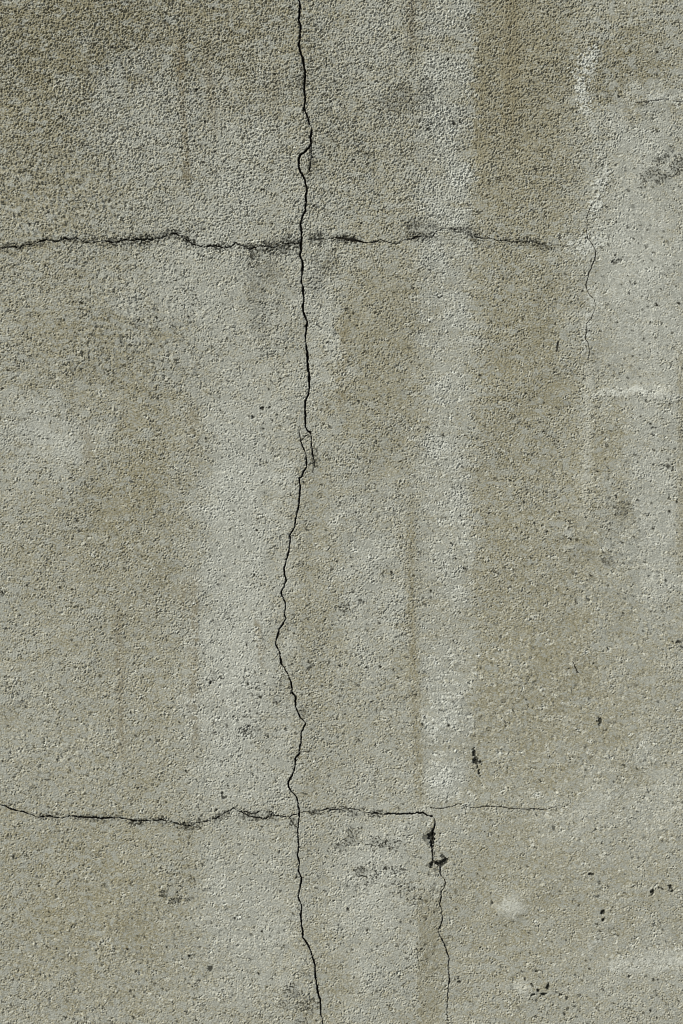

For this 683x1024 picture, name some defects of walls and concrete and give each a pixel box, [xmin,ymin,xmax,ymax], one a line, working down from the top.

crack [0,0,561,649]
crack [1,656,563,1024]